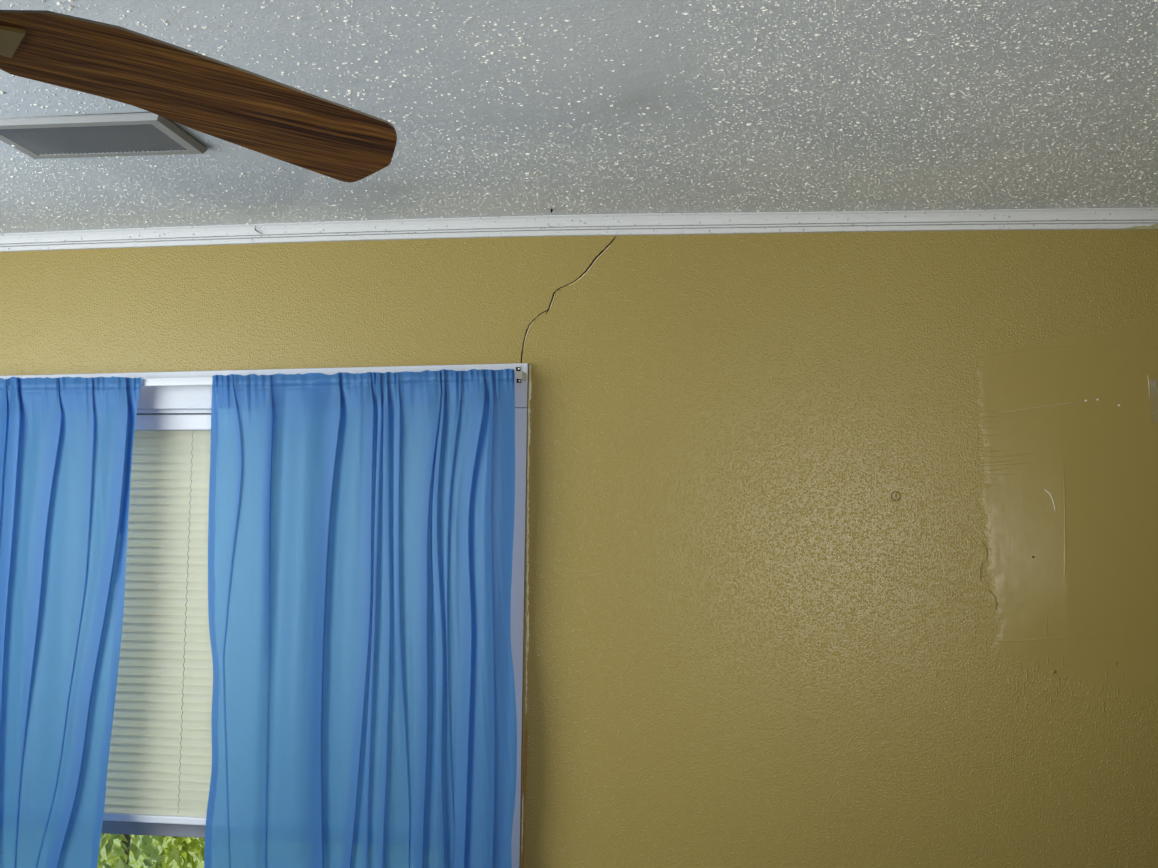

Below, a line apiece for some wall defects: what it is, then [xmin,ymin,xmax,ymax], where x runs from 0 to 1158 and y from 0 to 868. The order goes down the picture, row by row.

crack [521,237,616,714]